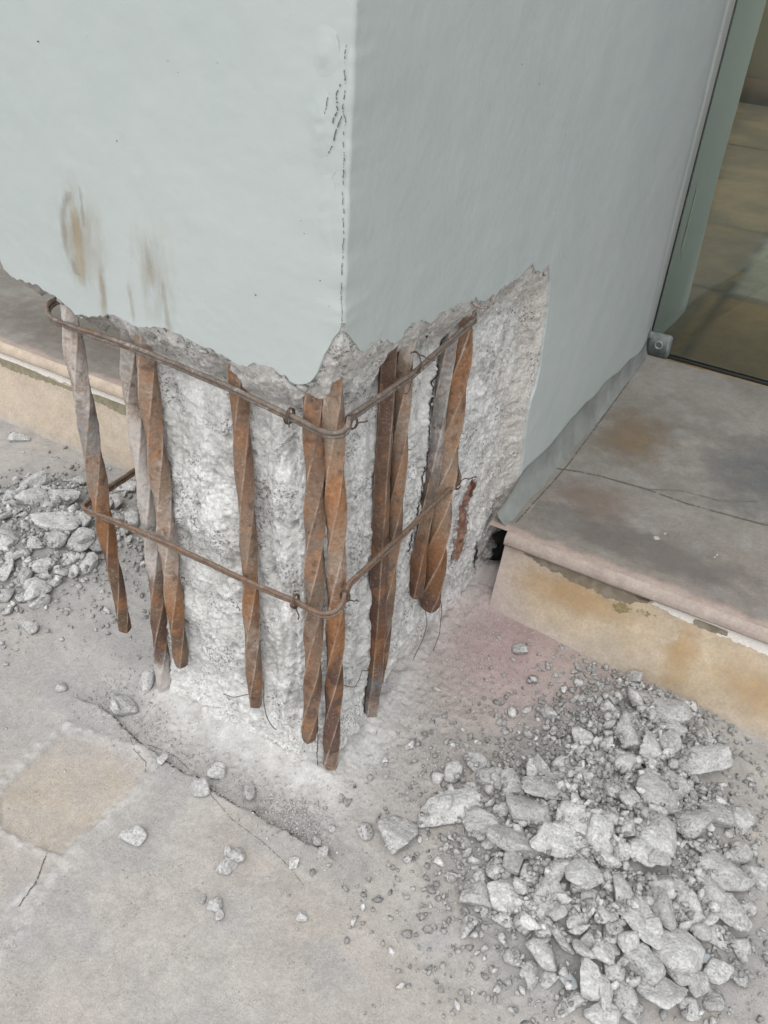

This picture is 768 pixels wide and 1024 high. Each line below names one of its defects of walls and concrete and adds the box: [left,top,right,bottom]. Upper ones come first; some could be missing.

crack [324,45,347,313]
peeling [0,353,72,391]
spalling [20,279,64,305]
spalling [77,263,549,755]
corrosion [447,477,477,561]
crack [473,363,767,568]
crack [108,712,307,884]